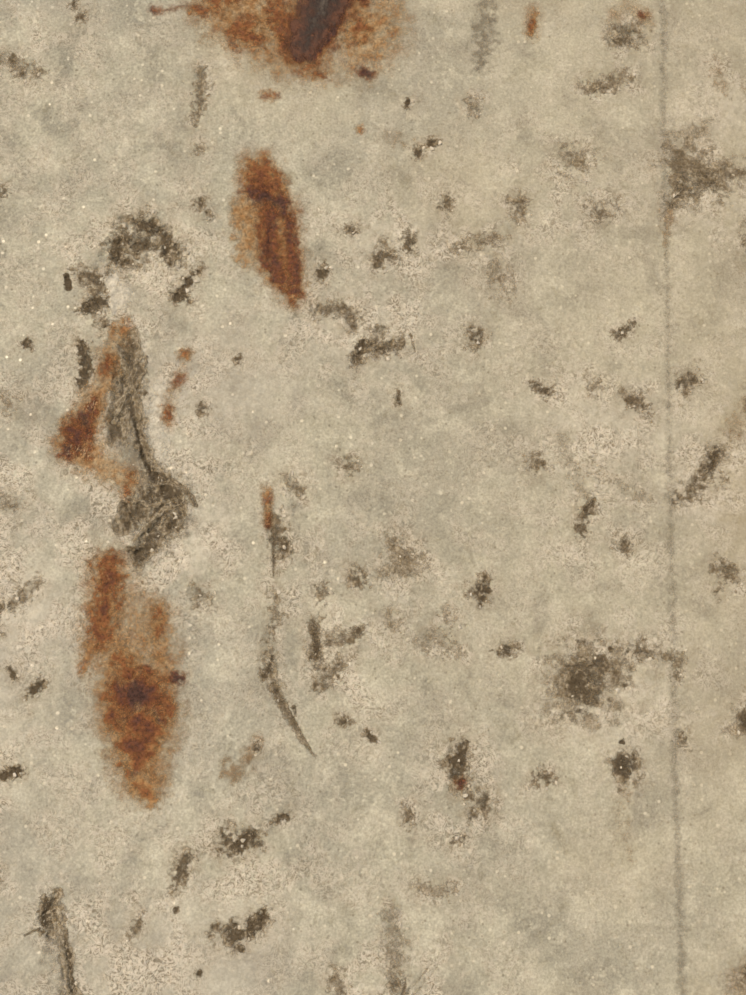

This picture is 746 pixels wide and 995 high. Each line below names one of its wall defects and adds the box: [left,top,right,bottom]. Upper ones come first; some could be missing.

corrosion [150,0,405,80]
corrosion [229,151,304,307]
corrosion [54,318,140,498]
corrosion [78,548,185,810]